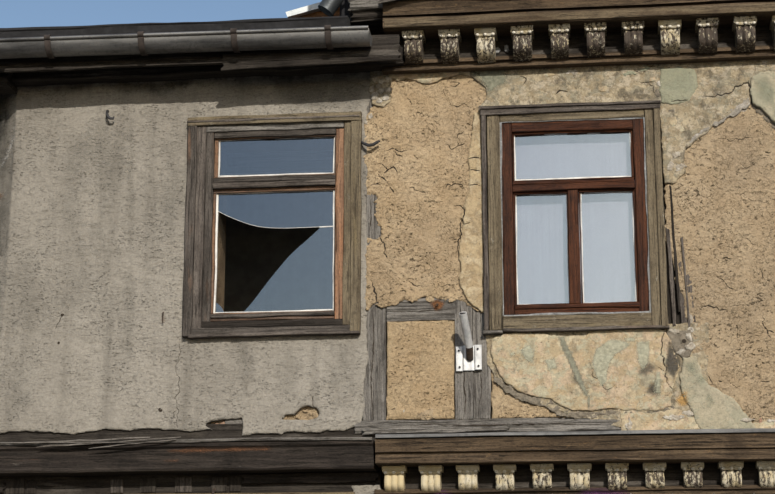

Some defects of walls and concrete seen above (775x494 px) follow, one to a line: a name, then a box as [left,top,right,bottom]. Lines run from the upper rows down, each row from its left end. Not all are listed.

crack [705,81,751,98]
crack [369,148,425,257]
crack [446,131,480,254]
spalling [364,59,775,430]
spalling [282,406,320,420]